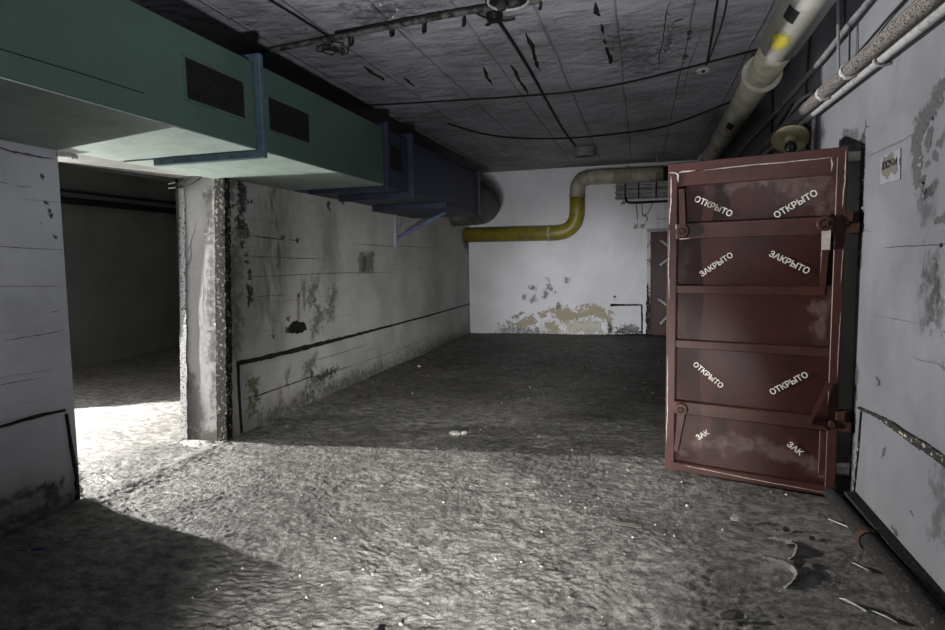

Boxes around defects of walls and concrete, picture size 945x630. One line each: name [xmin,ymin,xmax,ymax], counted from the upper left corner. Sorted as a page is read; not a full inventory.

flaking render [910,78,945,199]
peeling [495,303,615,335]